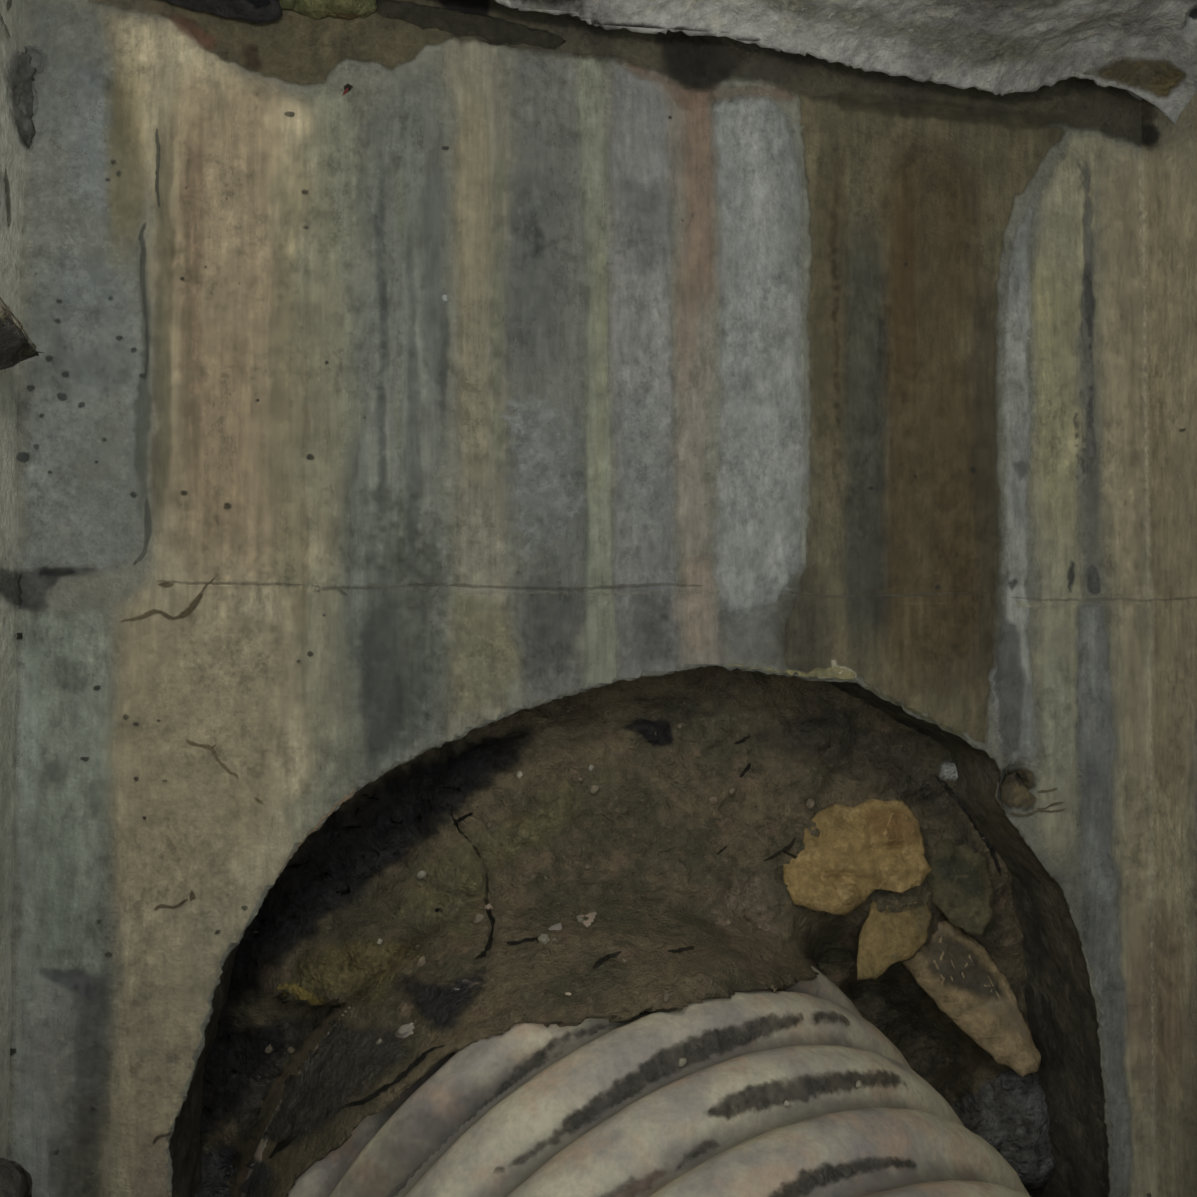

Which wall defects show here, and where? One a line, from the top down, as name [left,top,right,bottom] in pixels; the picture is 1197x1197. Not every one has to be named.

spalling [167,0,282,23]
water stain [95,0,496,85]
water stain [1099,59,1186,97]
water stain [297,89,358,530]
corrosion [627,64,723,664]
water stain [395,0,1159,1196]
spalling [732,660,856,679]
water stain [291,603,355,838]
crack [186,739,263,804]
spalling [1000,769,1036,808]
water stain [279,940,421,1005]